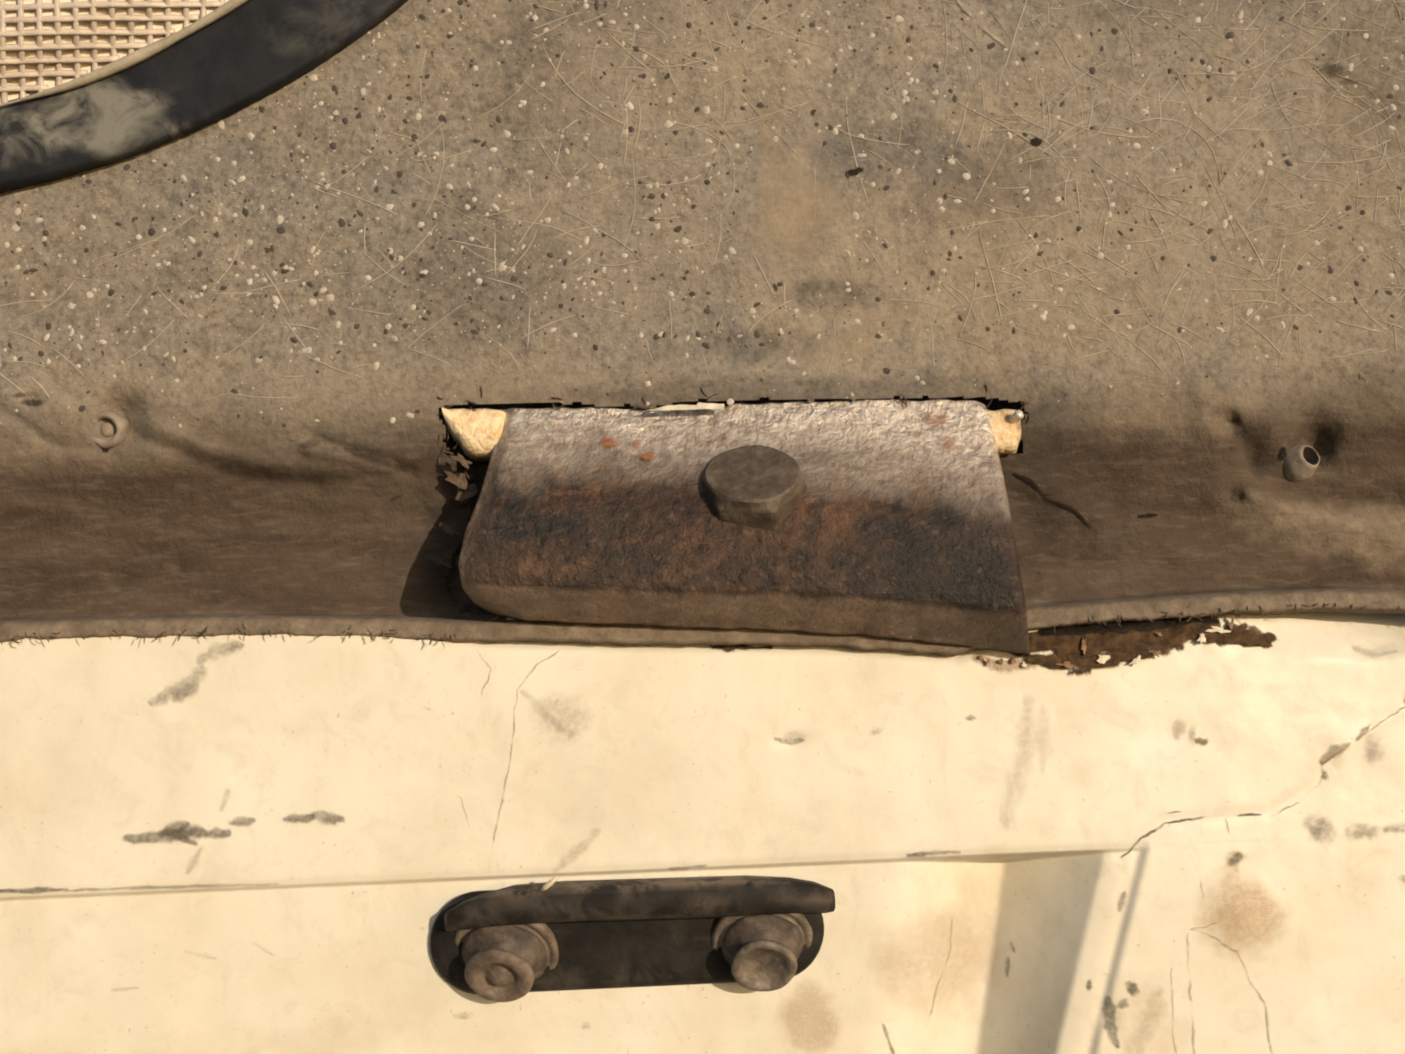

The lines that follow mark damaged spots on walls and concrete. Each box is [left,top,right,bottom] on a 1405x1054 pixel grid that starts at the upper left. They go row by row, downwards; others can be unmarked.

rust [978,616,1277,675]
crack [461,723,515,840]
crack [1121,804,1296,858]